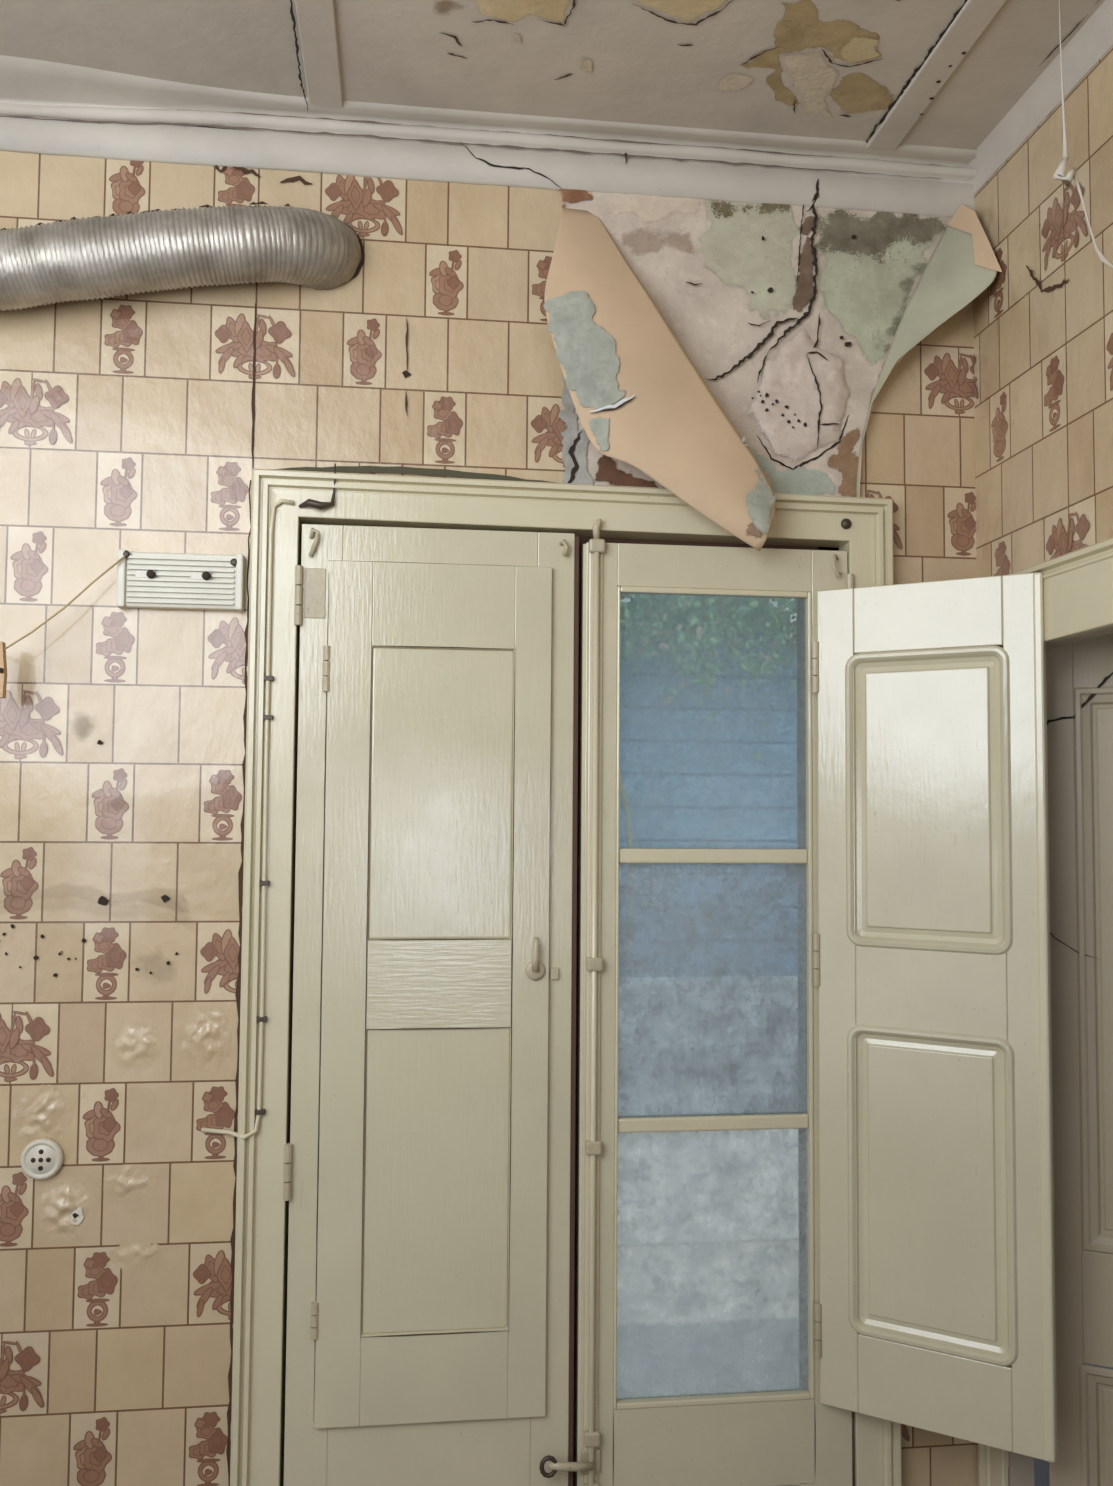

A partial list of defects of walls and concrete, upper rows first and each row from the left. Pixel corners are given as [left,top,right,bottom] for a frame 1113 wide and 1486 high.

peeling [473,0,576,26]
peeling [632,0,733,26]
peeling [716,0,894,118]
crack [866,0,968,143]
crack [705,179,838,447]
peeling [543,188,1002,534]